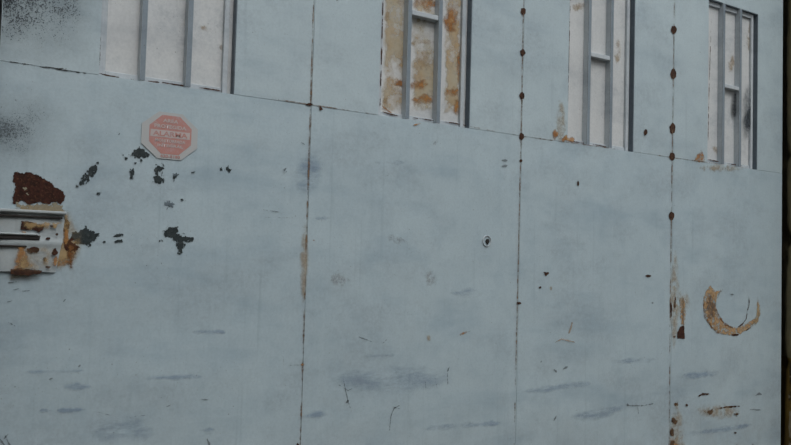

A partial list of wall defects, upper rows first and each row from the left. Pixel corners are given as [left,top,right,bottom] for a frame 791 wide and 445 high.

rust [380,0,434,116]
rust [444,0,476,128]
rust [12,172,65,205]
peeling [76,162,99,187]
peeling [123,146,150,179]
peeling [154,163,179,184]
rust [659,123,679,199]
rust [8,215,77,290]
peeling [64,226,123,260]
peeling [159,227,194,255]
rust [670,280,685,339]
rust [703,286,760,336]